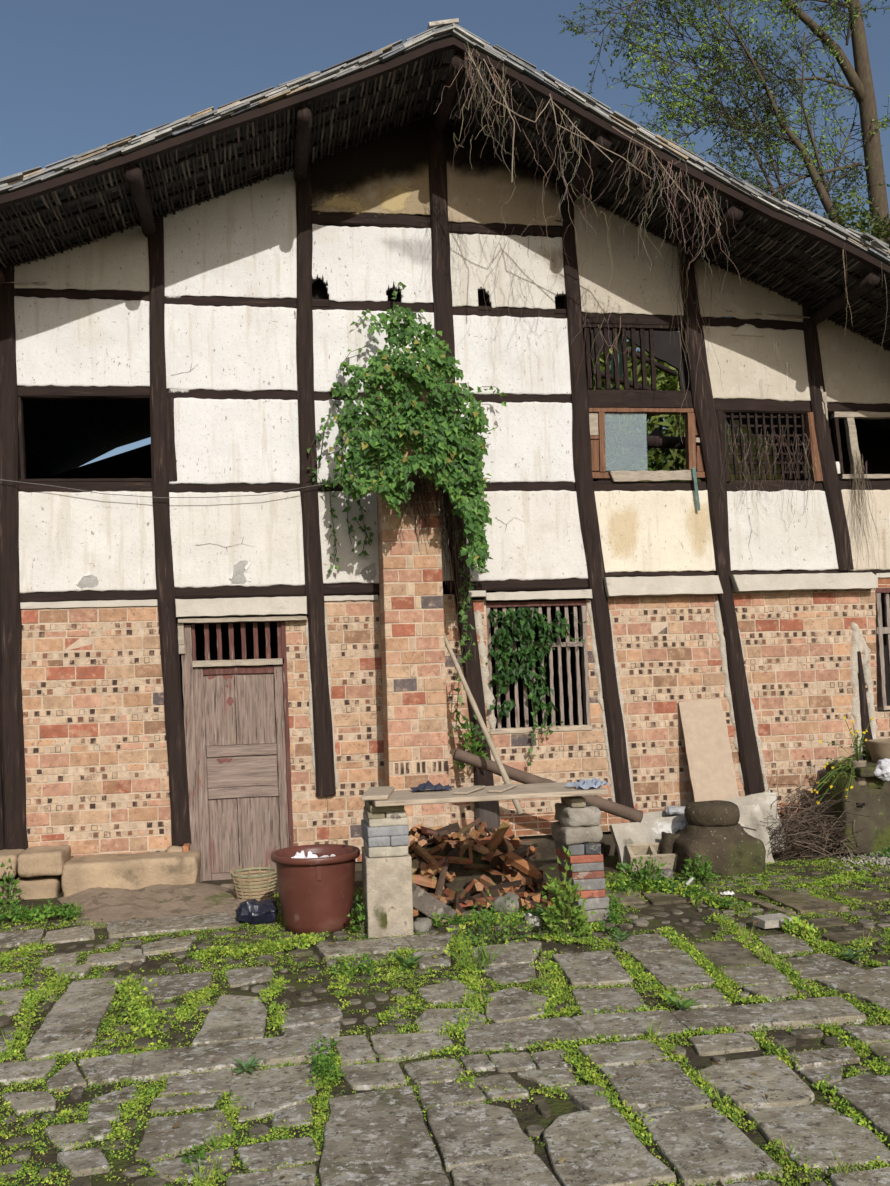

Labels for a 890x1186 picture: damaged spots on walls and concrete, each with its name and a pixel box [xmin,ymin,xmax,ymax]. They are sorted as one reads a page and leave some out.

flaking render [230,560,251,584]